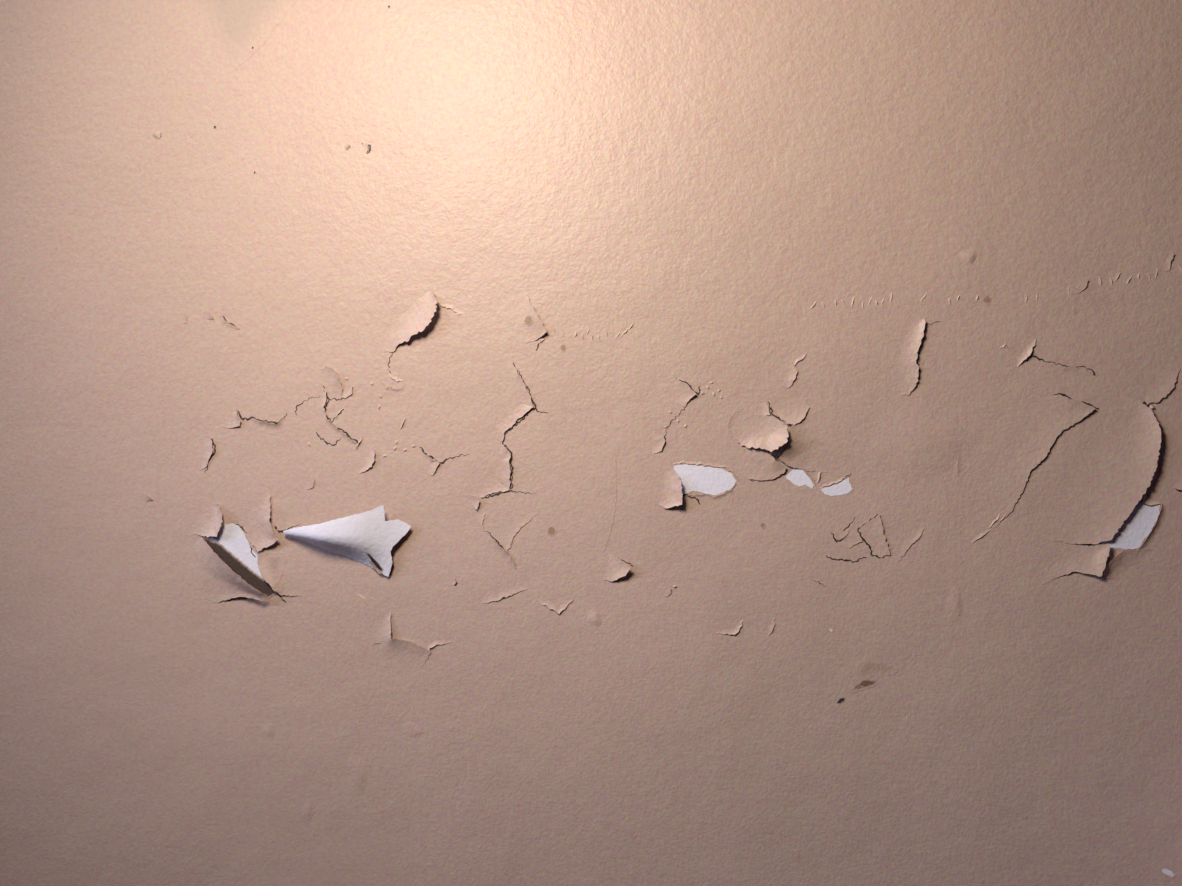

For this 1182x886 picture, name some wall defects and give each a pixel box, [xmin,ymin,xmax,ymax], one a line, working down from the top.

peeling [380,291,467,393]
peeling [897,319,940,397]
peeling [185,485,411,603]
crack [220,366,468,475]
crack [466,360,574,614]
peeling [603,554,633,581]
peeling [659,352,855,508]
peeling [971,367,1180,585]